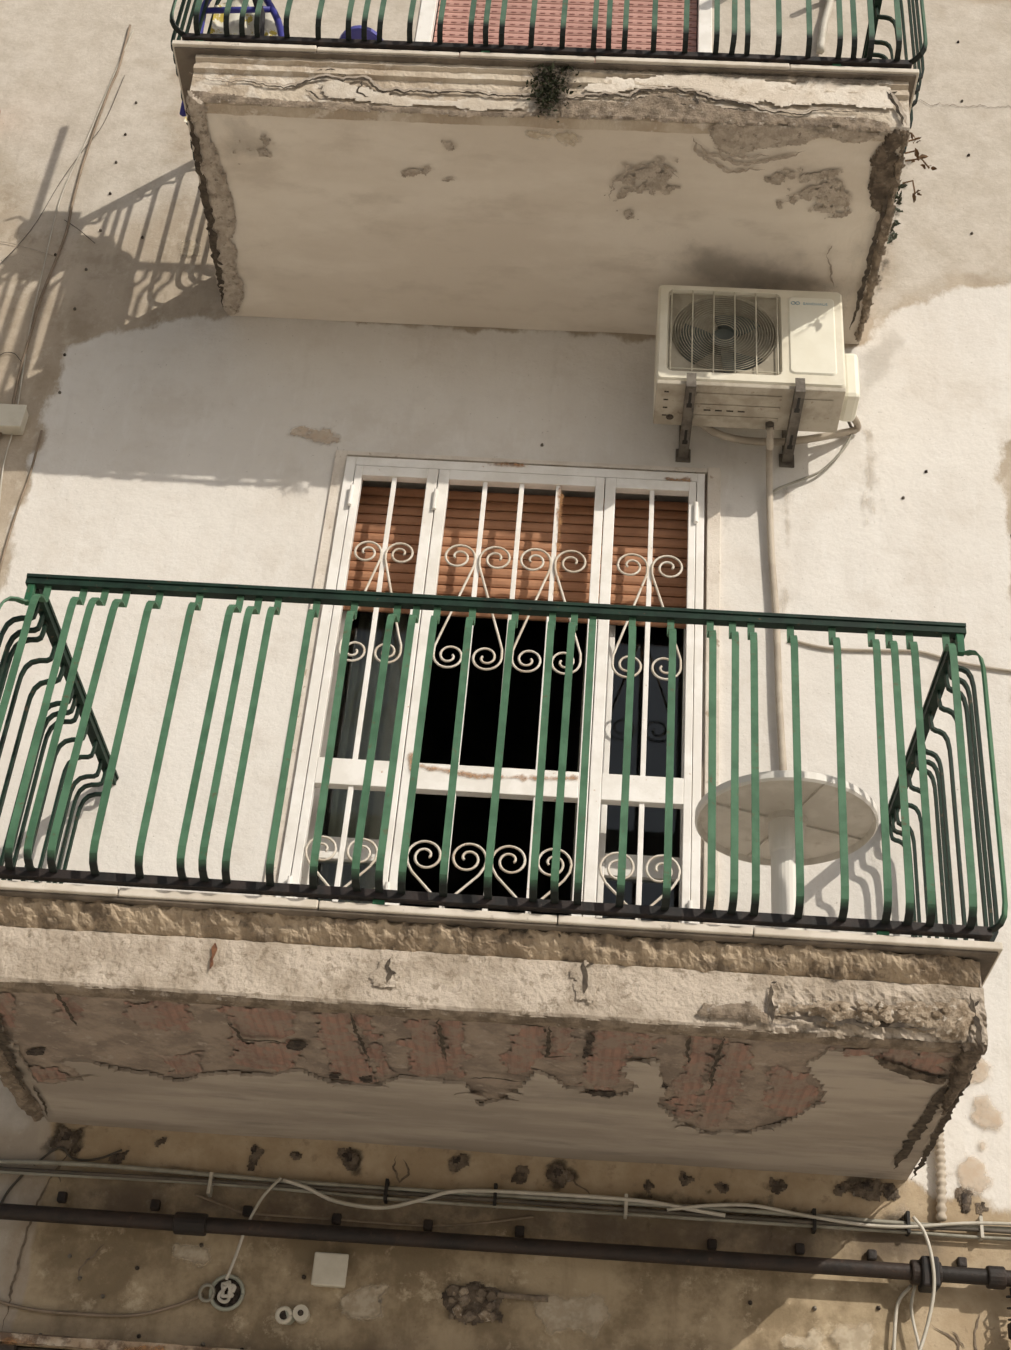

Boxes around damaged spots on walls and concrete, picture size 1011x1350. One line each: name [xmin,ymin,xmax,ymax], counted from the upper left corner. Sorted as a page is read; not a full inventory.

crack [189,68,1010,126]
spalling [181,79,544,316]
peeling [559,73,911,342]
peeling [290,426,339,443]
spalling [369,951,402,987]
spalling [569,960,606,1003]
spalling [0,991,1003,1216]
water stain [634,1191,808,1220]
water stain [174,1244,209,1263]
spalling [441,1281,504,1326]
crack [932,1315,1010,1350]